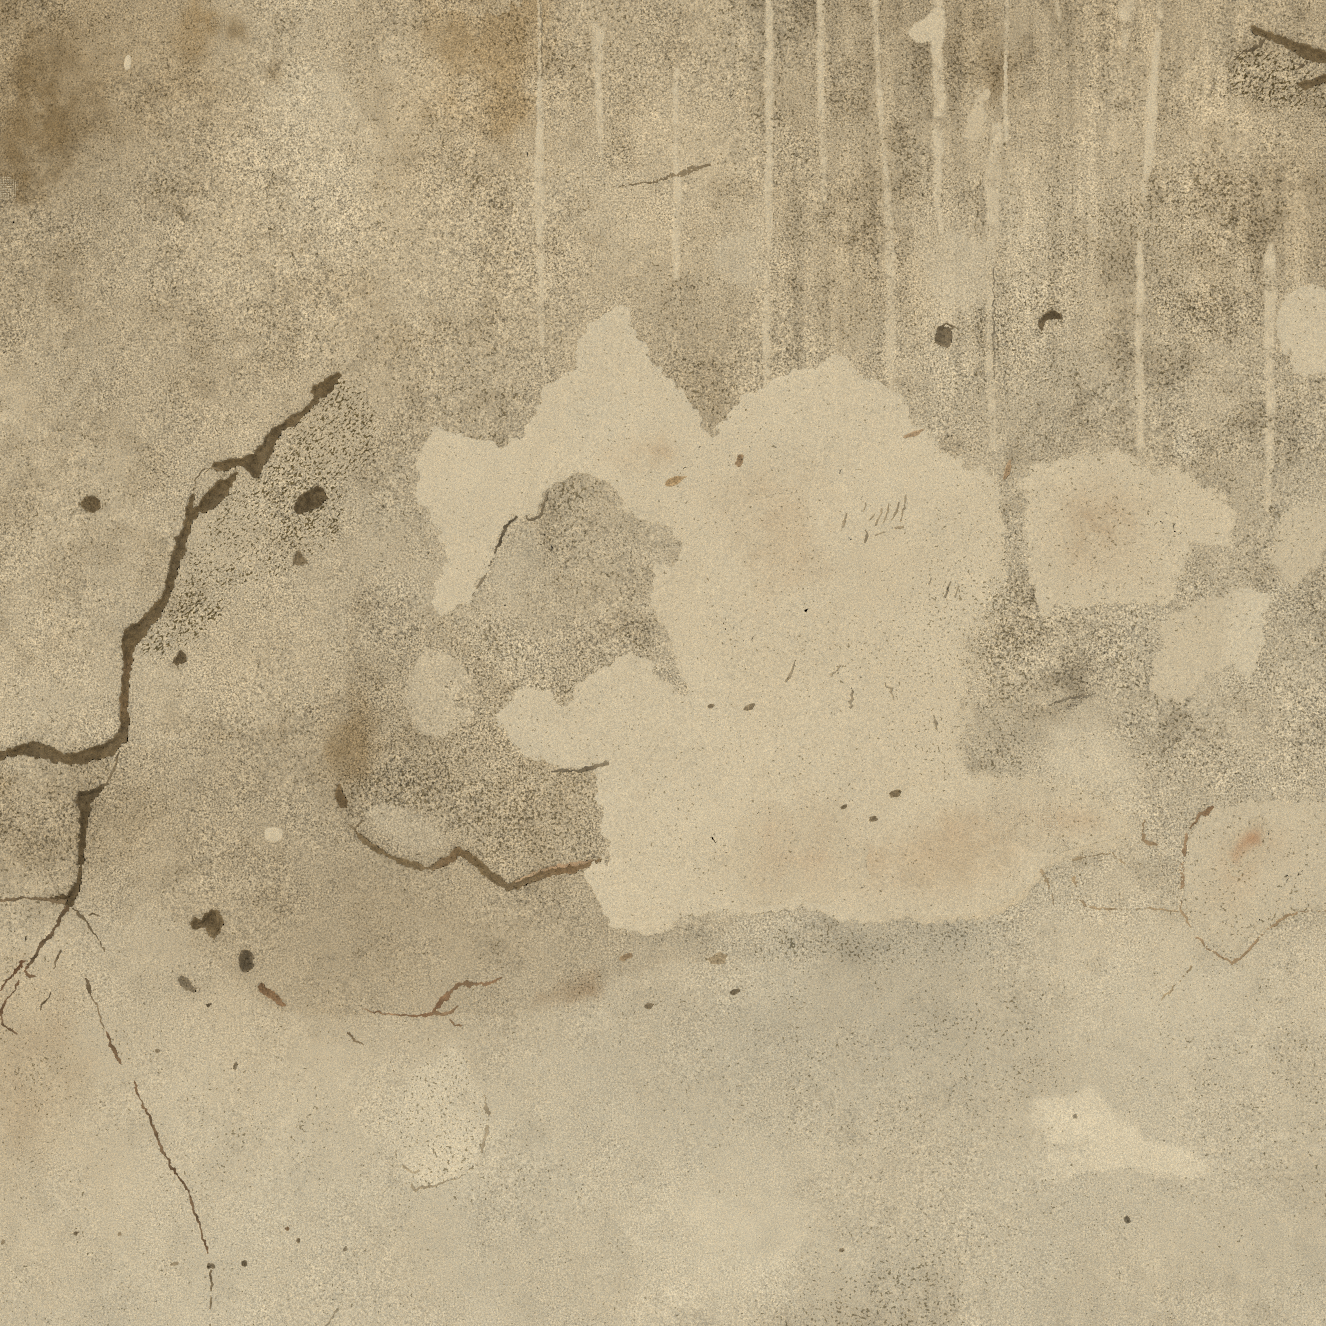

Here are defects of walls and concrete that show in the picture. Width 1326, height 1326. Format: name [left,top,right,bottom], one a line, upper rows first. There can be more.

water stain [955,16,1029,115]
crack [1233,25,1326,90]
crack [613,163,711,188]
peeling [415,303,1272,936]
peeling [399,642,480,743]
crack [551,761,609,773]
crack [0,372,342,1326]
crack [348,820,602,891]
crack [1039,806,1326,1001]
crack [347,977,502,1045]